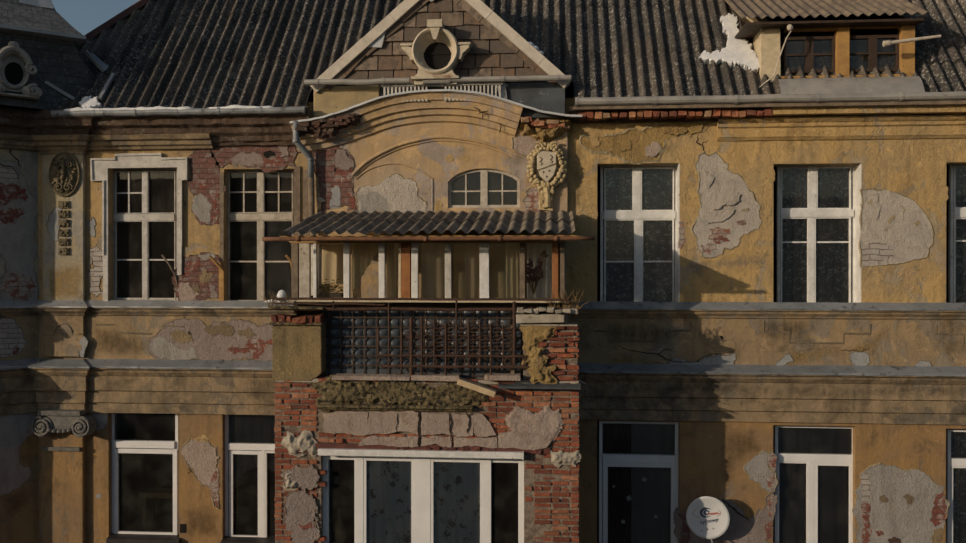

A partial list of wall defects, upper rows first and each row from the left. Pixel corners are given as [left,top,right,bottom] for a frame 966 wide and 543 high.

flaking render [187,146,298,226]
spalling [312,146,442,214]
flaking render [511,117,775,259]
flaking render [858,141,949,269]
flaking render [172,252,220,301]
flaking render [0,317,28,358]
flaking render [148,317,272,361]
flaking render [0,412,39,496]
flaking render [180,434,221,510]
spalling [283,464,321,543]
flaking render [673,450,779,543]
flaking render [852,462,950,543]